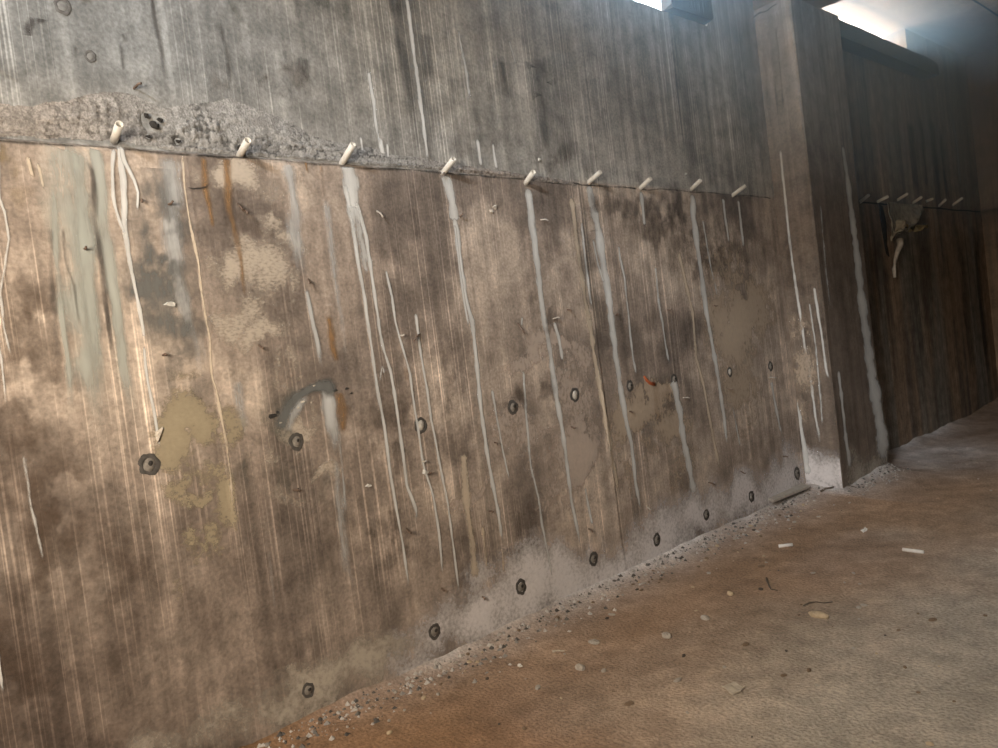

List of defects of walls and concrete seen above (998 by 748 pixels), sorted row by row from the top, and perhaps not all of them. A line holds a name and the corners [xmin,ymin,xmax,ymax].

damp [0,198,16,391]
damp [26,157,44,187]
damp [53,147,190,385]
corrosion [224,160,234,229]
damp [261,147,888,725]